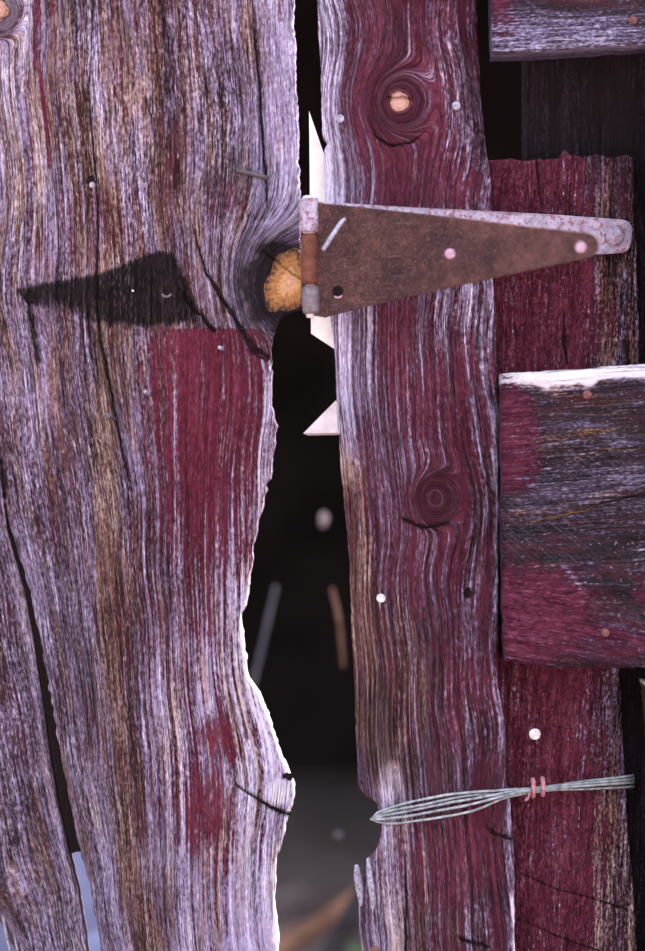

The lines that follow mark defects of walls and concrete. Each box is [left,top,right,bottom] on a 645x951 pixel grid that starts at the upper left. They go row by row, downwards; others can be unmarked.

crack [180,224,270,362]
crack [399,517,449,529]
crack [530,494,645,523]
crack [0,460,81,853]
crack [235,784,292,816]
crack [523,873,627,909]
crack [519,917,600,951]